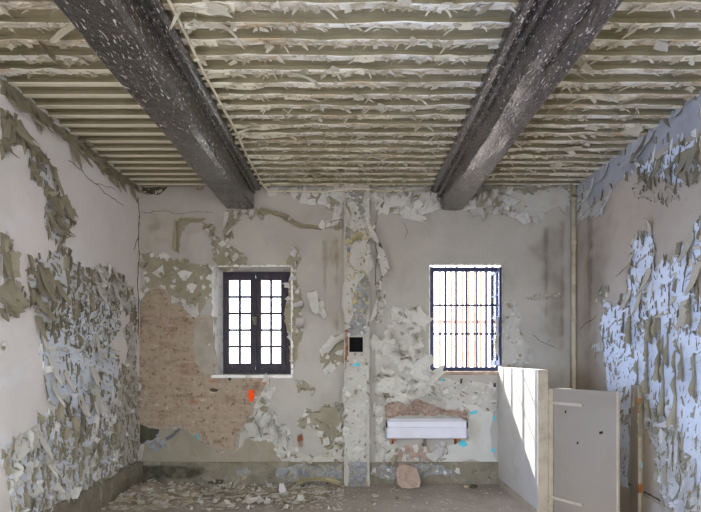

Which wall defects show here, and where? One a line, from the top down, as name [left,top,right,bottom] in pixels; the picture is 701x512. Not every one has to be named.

peeling [627,2,701,29]
peeling [464,22,701,230]
crack [68,160,213,339]
spalling [0,0,505,512]
peeling [590,216,701,512]